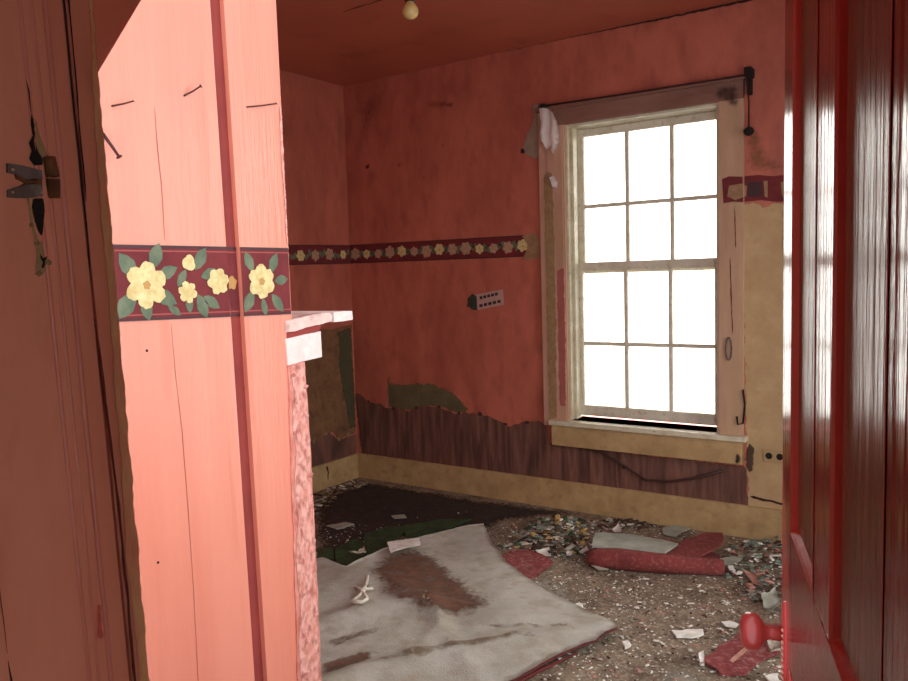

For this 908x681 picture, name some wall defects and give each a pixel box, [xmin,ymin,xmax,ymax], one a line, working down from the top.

peeling [290,173,784,681]